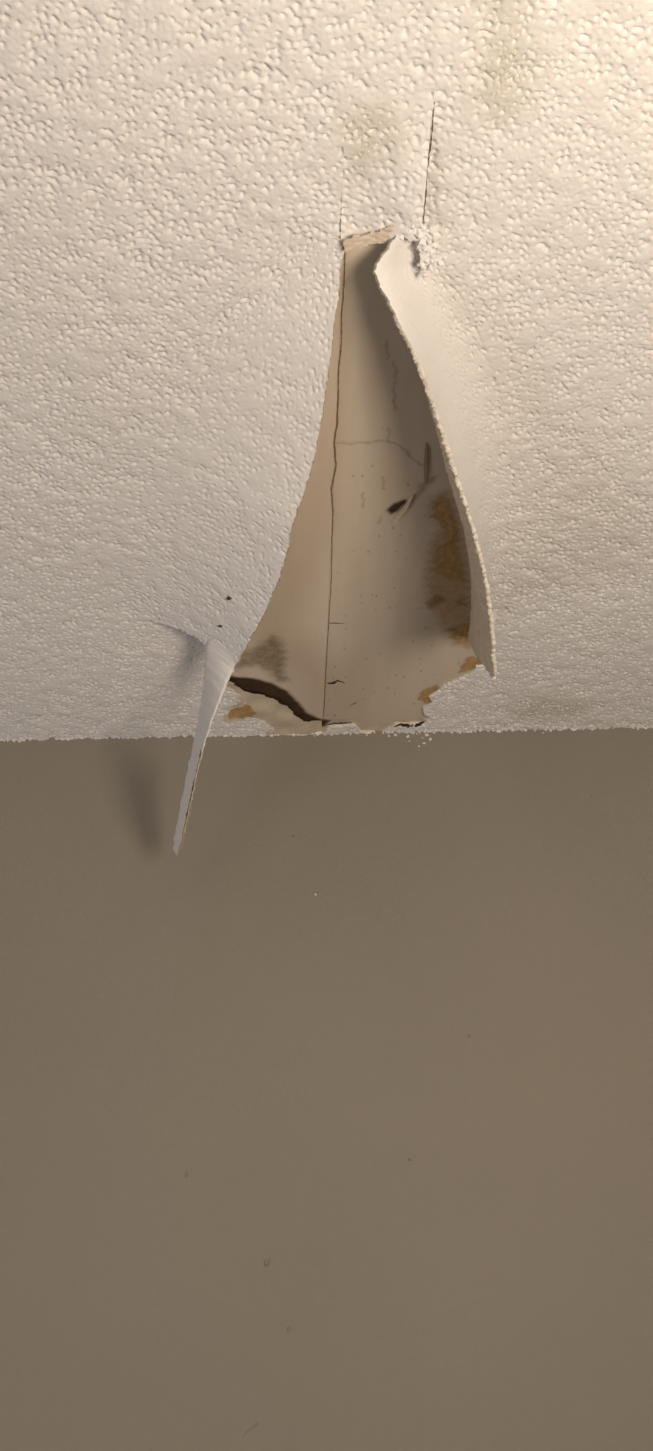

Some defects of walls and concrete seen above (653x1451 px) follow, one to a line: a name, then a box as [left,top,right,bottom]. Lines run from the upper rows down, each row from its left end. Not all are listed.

peeling [98,83,514,856]